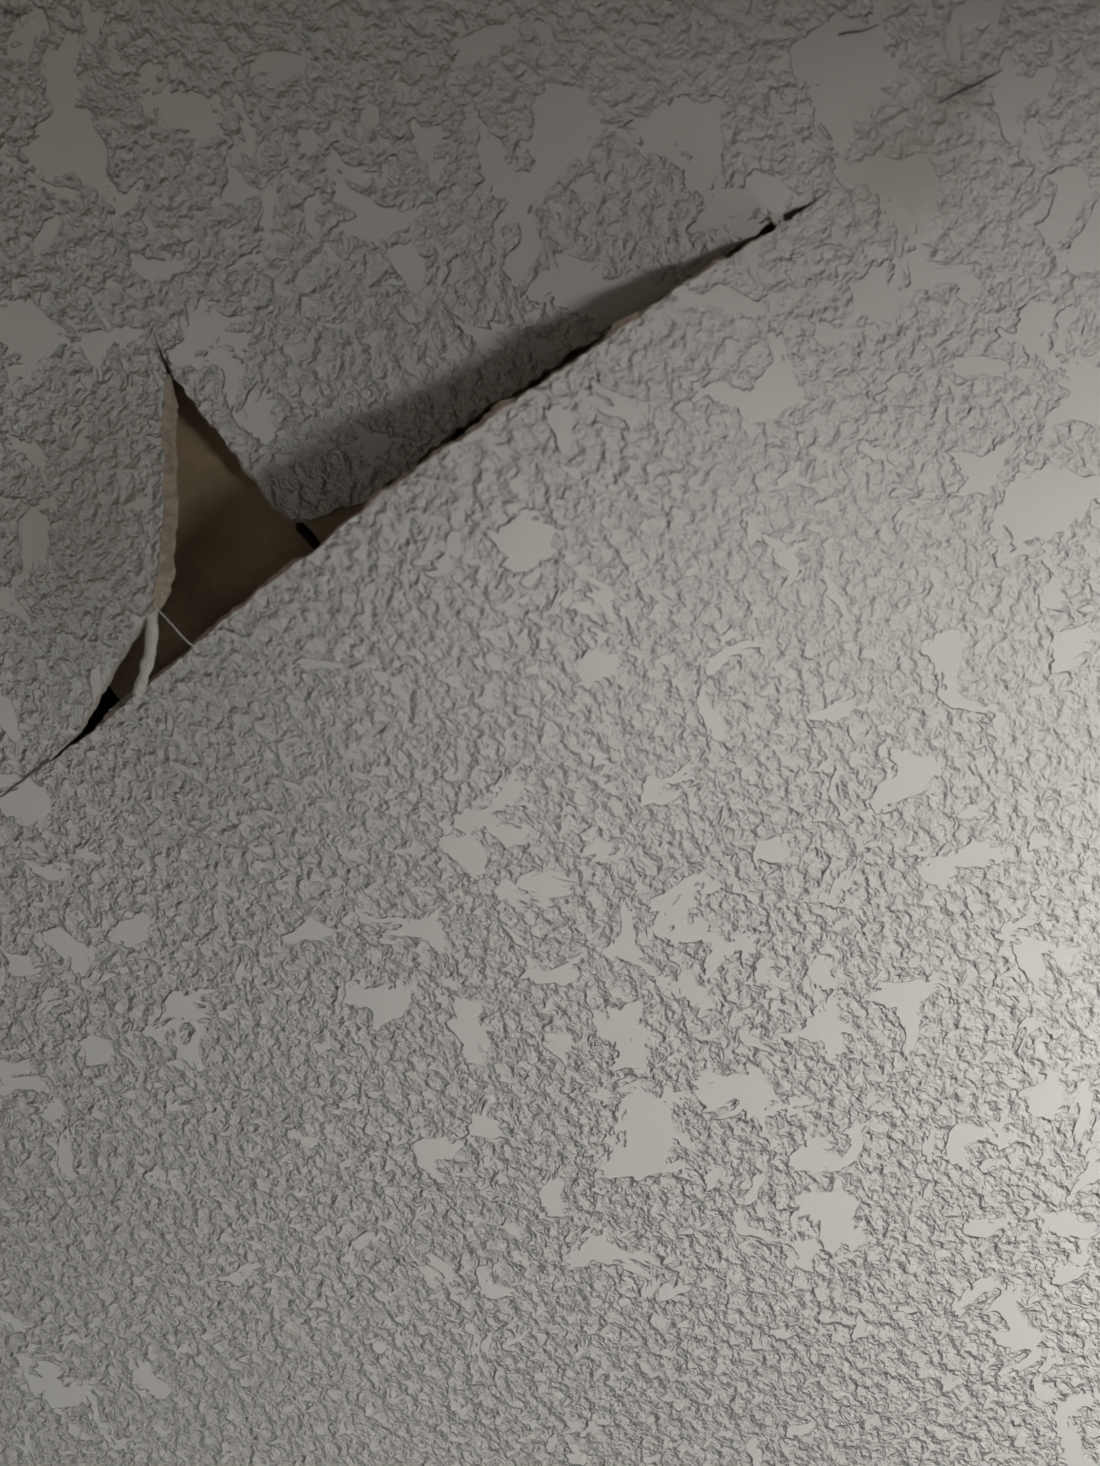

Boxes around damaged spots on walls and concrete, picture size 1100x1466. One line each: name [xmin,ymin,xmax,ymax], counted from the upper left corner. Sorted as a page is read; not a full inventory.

crack [784,189,830,221]
crack [148,323,172,374]
crack [0,758,50,798]